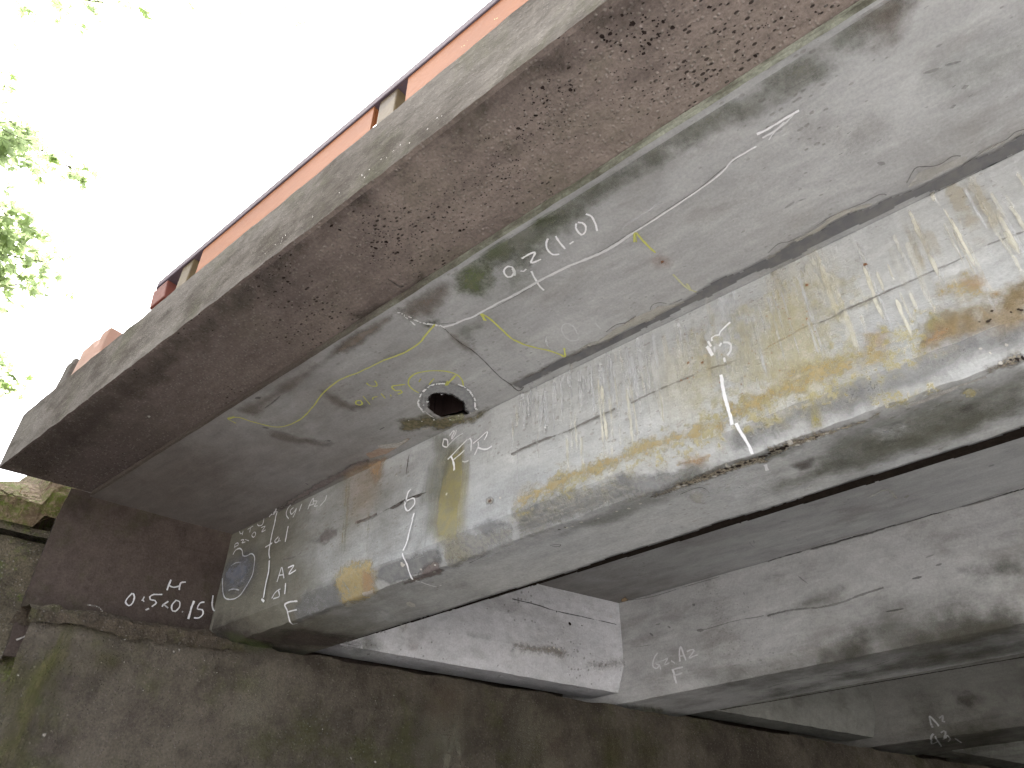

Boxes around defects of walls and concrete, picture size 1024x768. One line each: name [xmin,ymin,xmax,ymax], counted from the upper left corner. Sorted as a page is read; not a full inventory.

water stain [336,318,390,352]
crack [359,306,381,318]
water stain [404,287,446,317]
crack [437,284,536,391]
corrosion [922,272,1024,346]
spalling [444,343,1024,567]
water stain [212,378,1024,647]
corrosion [334,560,377,607]